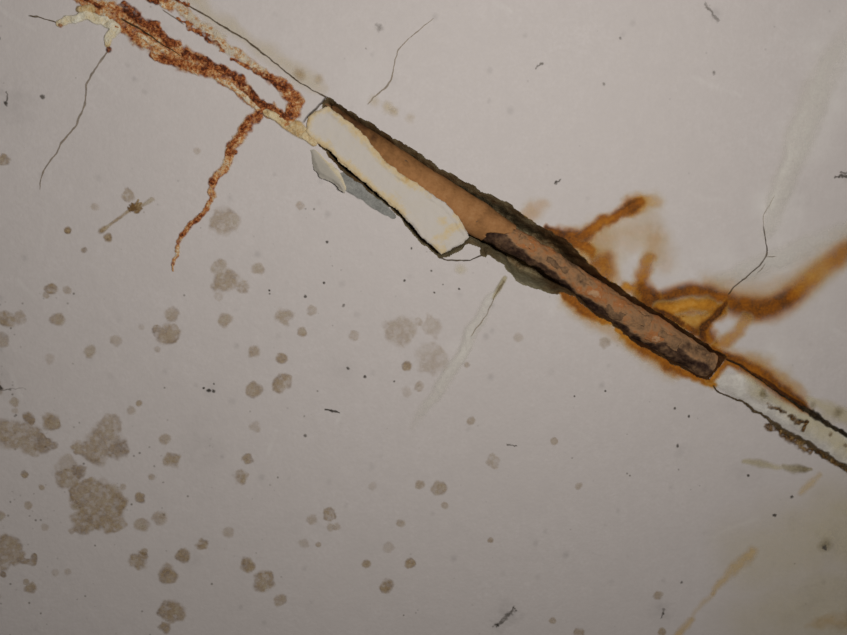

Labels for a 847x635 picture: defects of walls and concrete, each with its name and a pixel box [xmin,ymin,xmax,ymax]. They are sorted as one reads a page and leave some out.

crack [40,53,107,182]
crack [75,0,326,272]
corrosion [99,198,152,241]
flaking render [305,97,727,380]
corrosion [544,196,654,290]
crack [729,227,774,294]
corrosion [560,244,847,414]
crack [713,360,847,472]
leakage [60,467,126,532]